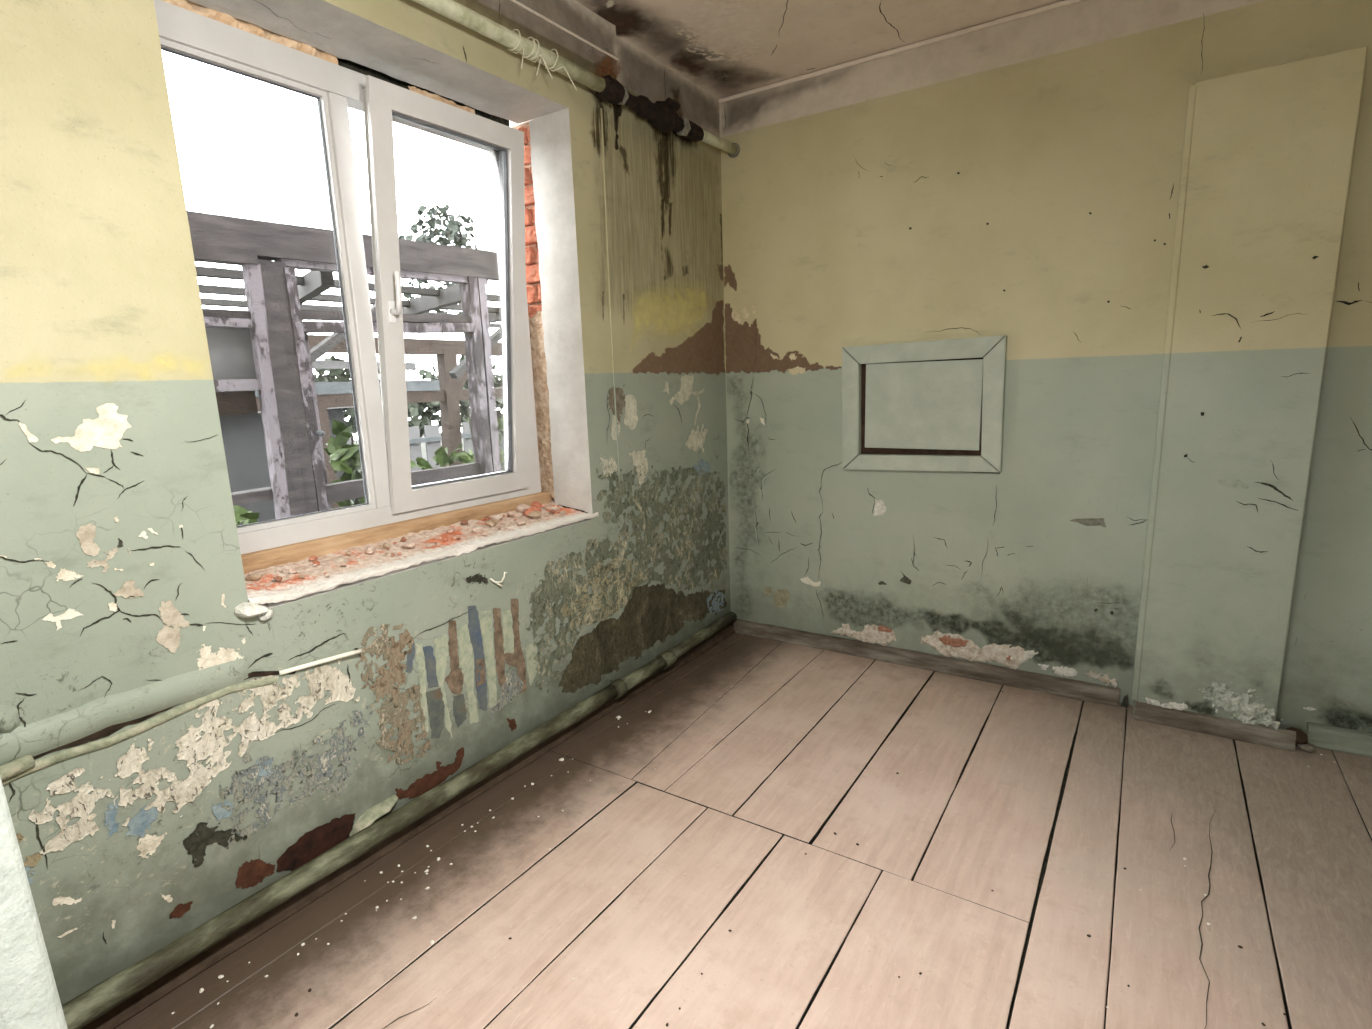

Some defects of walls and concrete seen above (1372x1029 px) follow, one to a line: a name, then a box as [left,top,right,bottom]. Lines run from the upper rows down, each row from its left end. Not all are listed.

water stain [591,0,759,88]
water stain [592,103,628,171]
water stain [655,130,687,276]
peeling [188,0,728,719]
crack [0,400,143,506]
peeling [19,403,133,473]
crack [0,498,344,668]
peeling [156,583,244,670]
water stain [826,593,1133,667]
crack [78,676,113,698]
peeling [16,623,431,884]
crack [1198,810,1216,1029]